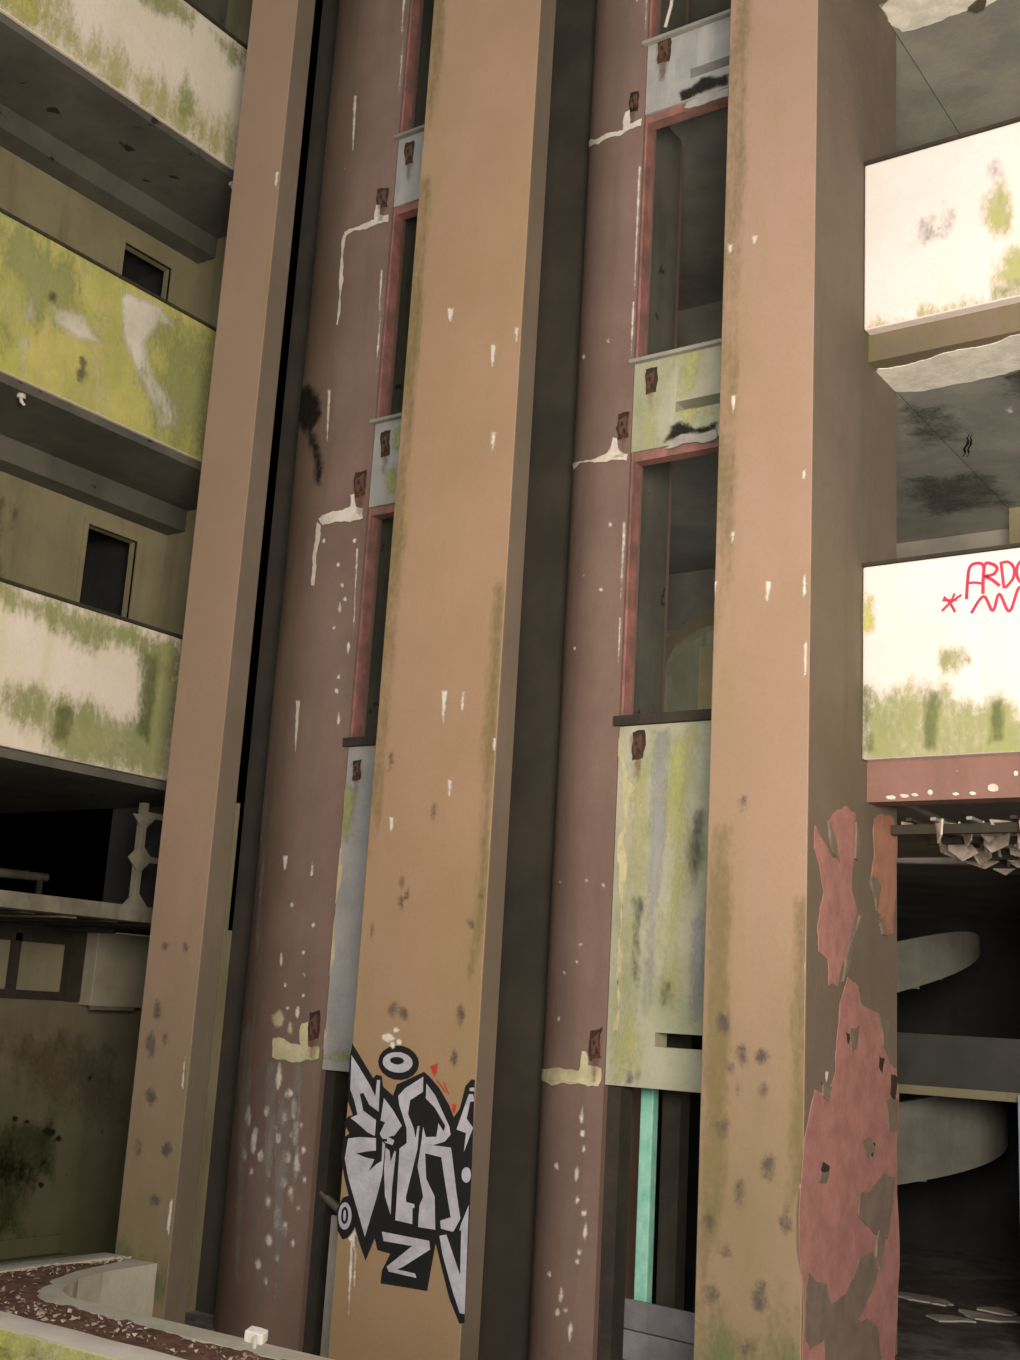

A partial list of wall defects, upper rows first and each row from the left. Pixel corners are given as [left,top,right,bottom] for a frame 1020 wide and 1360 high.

peeling [881,0,996,32]
damp [53,305,99,342]
damp [122,292,178,428]
damp [139,654,157,739]
damp [56,707,71,737]
spalling [953,784,999,796]
peeling [799,790,933,1360]